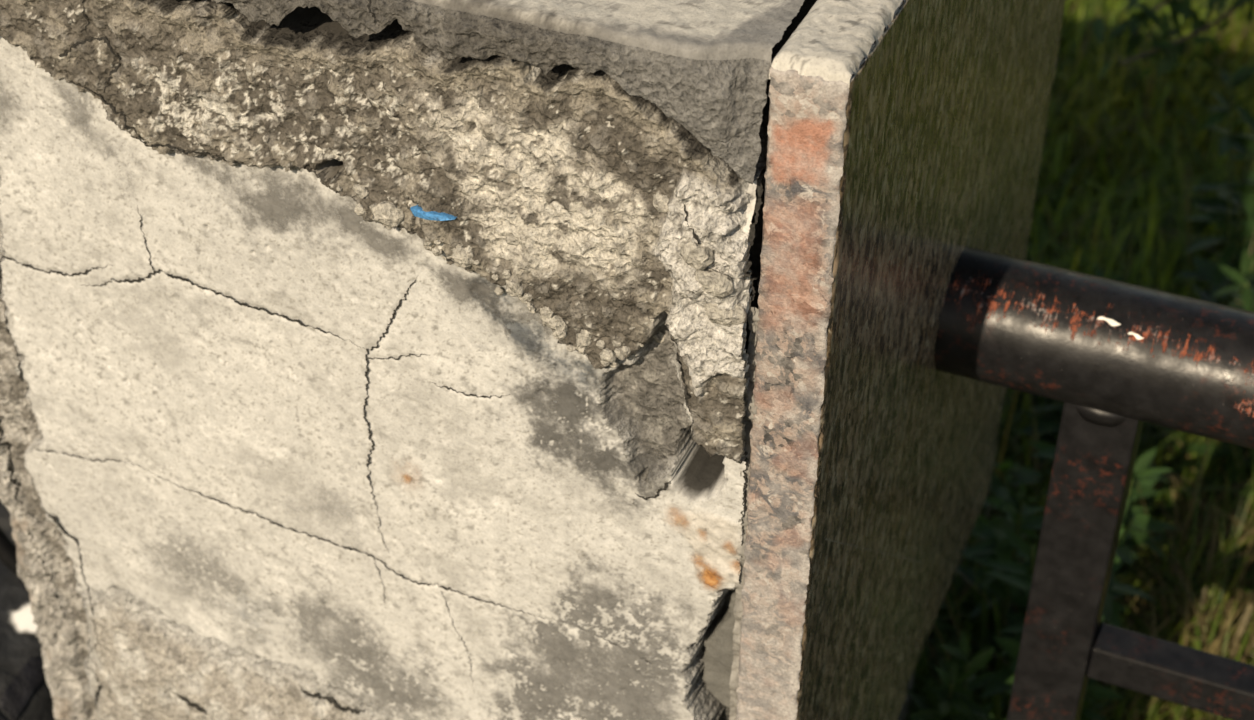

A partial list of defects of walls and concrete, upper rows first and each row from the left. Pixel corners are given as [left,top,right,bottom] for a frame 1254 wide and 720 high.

spalling [0,0,755,493]
crack [683,203,700,244]
spalling [0,201,99,720]
crack [0,211,665,707]
crack [636,324,694,500]
crack [731,170,766,583]
corrosion [943,271,1254,417]
corrosion [696,557,721,589]
crack [172,692,208,715]
crack [298,684,365,715]